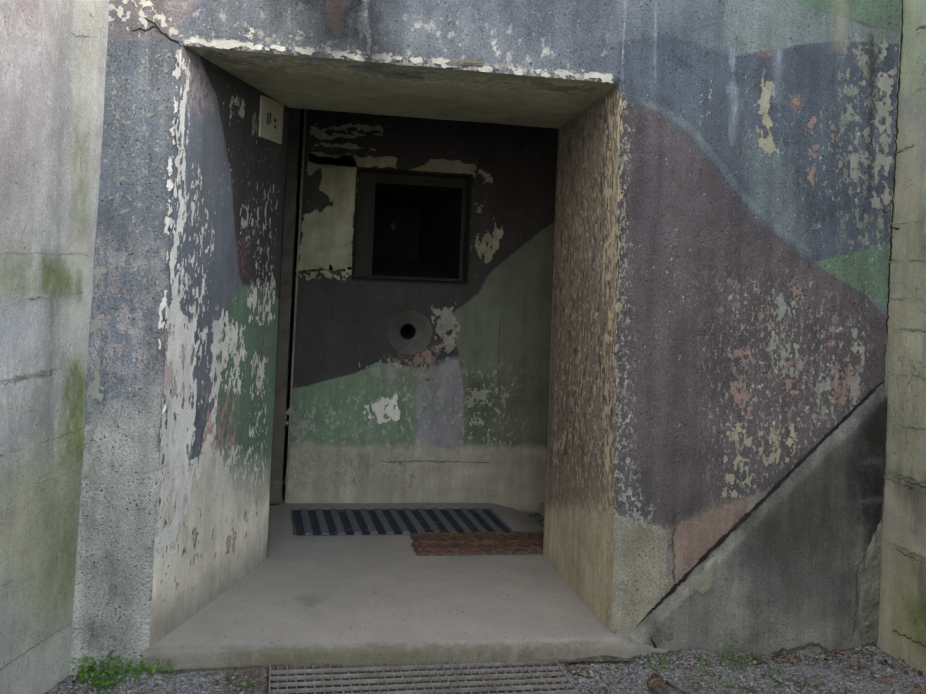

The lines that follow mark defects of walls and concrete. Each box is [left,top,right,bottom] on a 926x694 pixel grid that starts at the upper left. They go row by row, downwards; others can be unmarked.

crack [131,18,180,45]
peeling [756,78,780,154]
peeling [807,116,820,187]
peeling [828,36,898,209]
peeling [80,350,104,507]
peeling [99,0,660,631]
peeling [721,279,866,498]